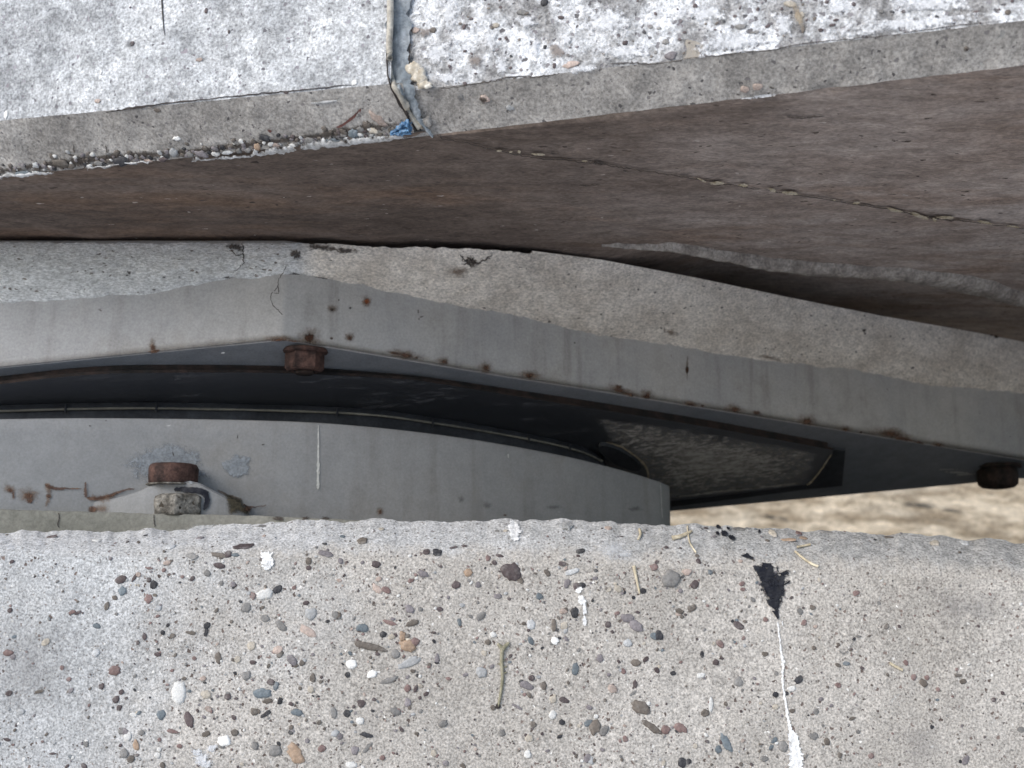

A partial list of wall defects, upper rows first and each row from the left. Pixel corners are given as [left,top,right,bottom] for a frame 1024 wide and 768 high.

crack [437,135,1022,229]
rust [5,482,133,512]
efflorescence [777,621,804,768]